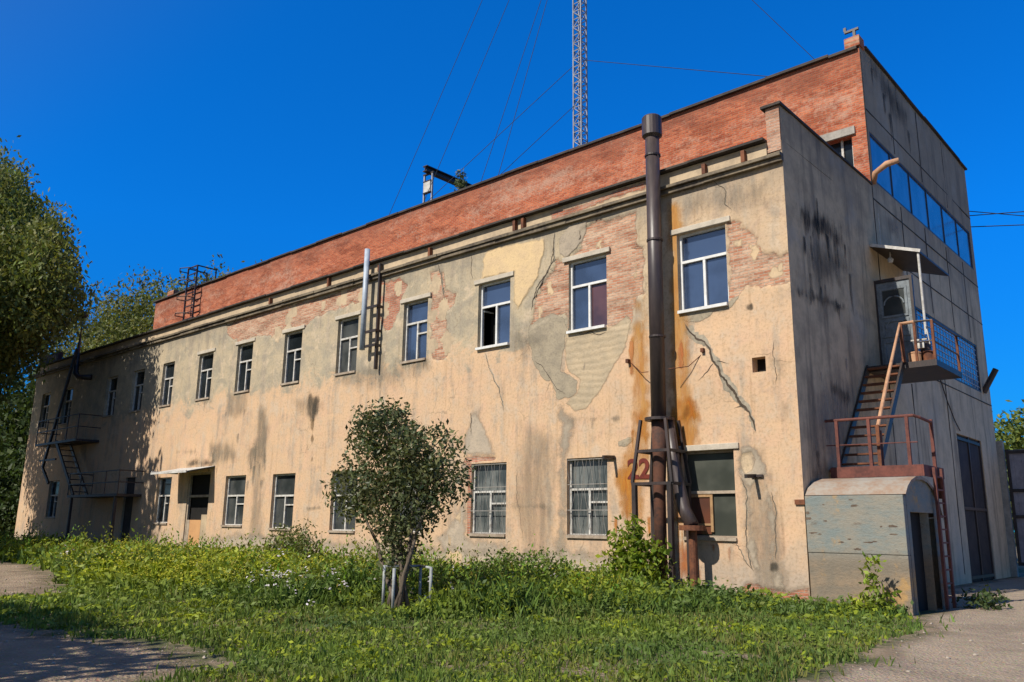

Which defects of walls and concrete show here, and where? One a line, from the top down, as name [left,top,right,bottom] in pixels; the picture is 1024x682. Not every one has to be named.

flaking render [227,286,363,343]
flaking render [380,277,408,330]
flaking render [427,271,456,360]
flaking render [531,212,645,328]
rust [669,204,698,461]
flaking render [727,220,790,299]
damp [804,202,846,267]
damp [309,397,318,439]
crack [485,353,504,408]
rust [614,326,650,533]
crack [685,324,756,431]